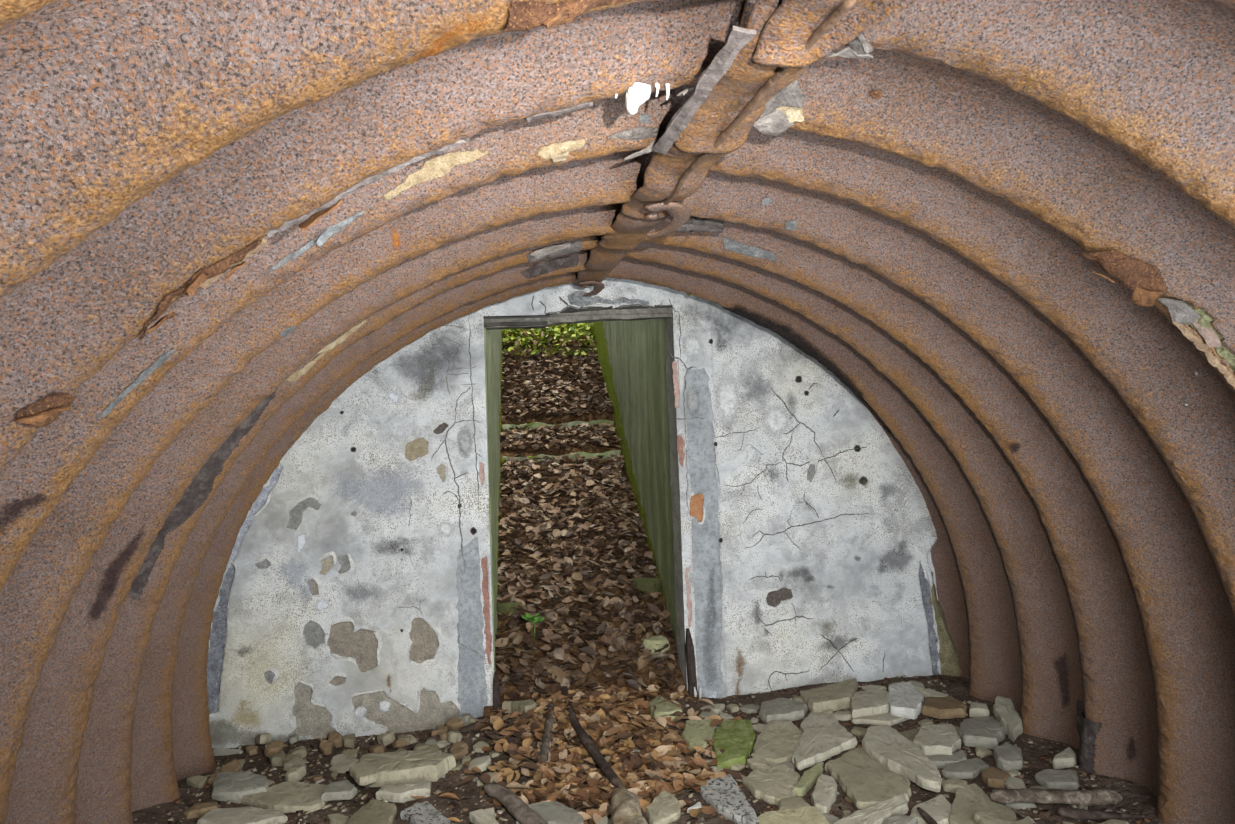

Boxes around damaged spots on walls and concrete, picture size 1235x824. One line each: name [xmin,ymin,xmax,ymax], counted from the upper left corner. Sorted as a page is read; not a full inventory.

corrosion [502,0,632,32]
peeling [753,80,805,136]
peeling [201,138,470,289]
corrosion [138,236,265,340]
corrosion [1081,250,1169,306]
peeling [1158,298,1235,389]
corrosion [15,392,76,428]
flaking render [401,419,451,482]
crack [531,296,869,691]
flaking render [289,527,492,739]